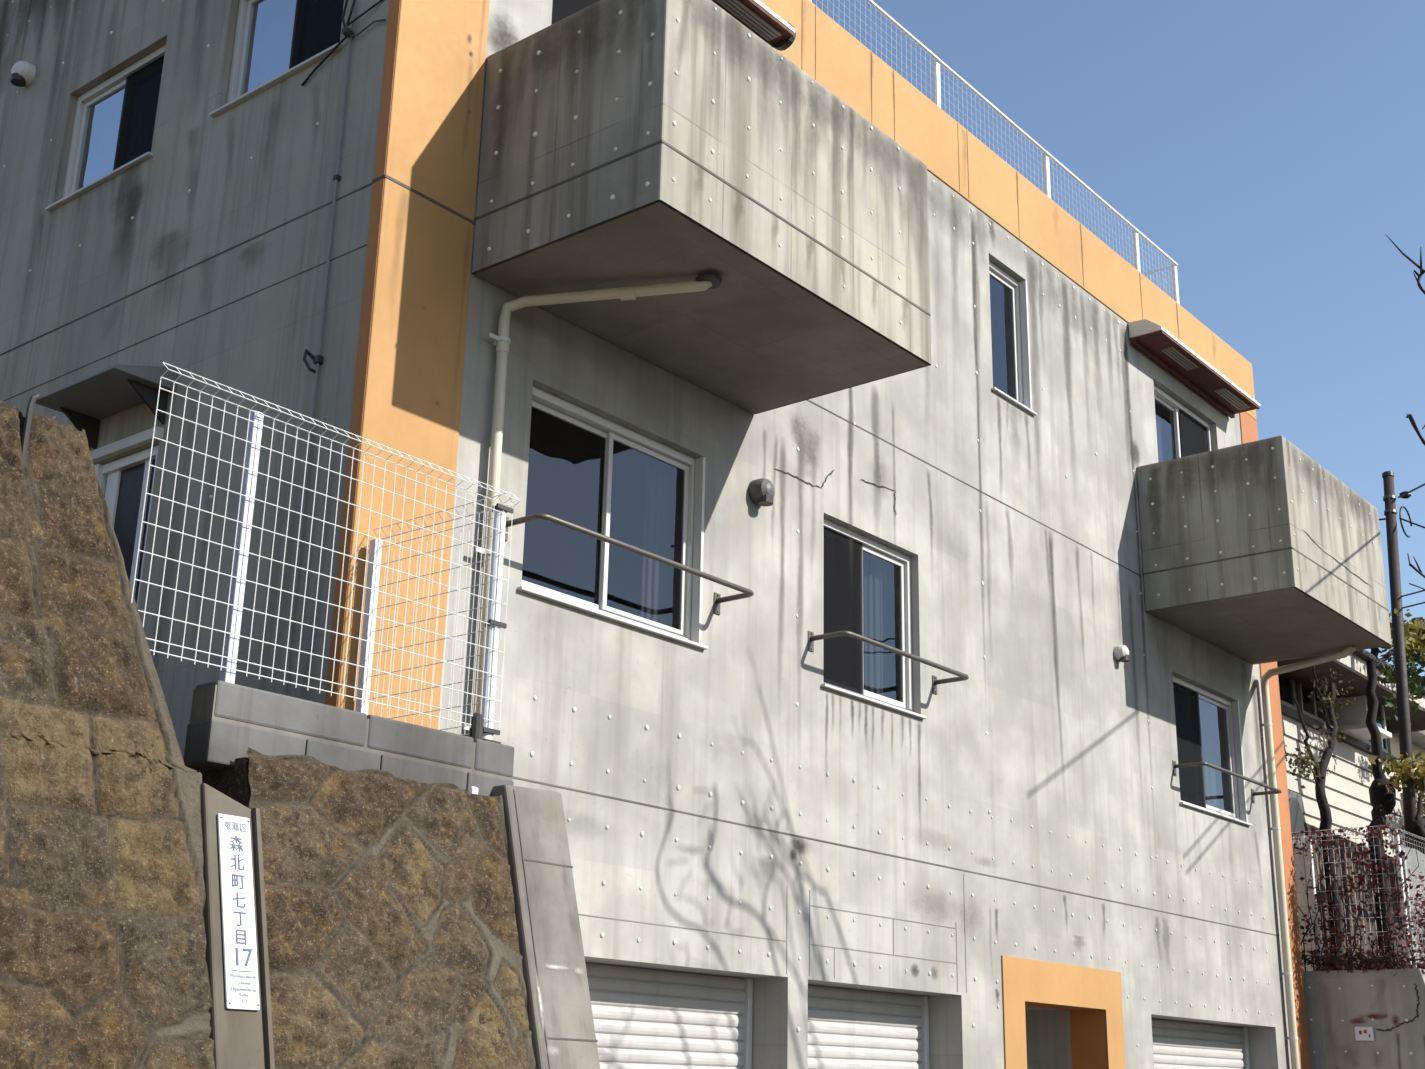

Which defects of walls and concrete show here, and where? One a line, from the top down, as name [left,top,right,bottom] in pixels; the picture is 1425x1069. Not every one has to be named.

water stain [1126,349,1144,628]